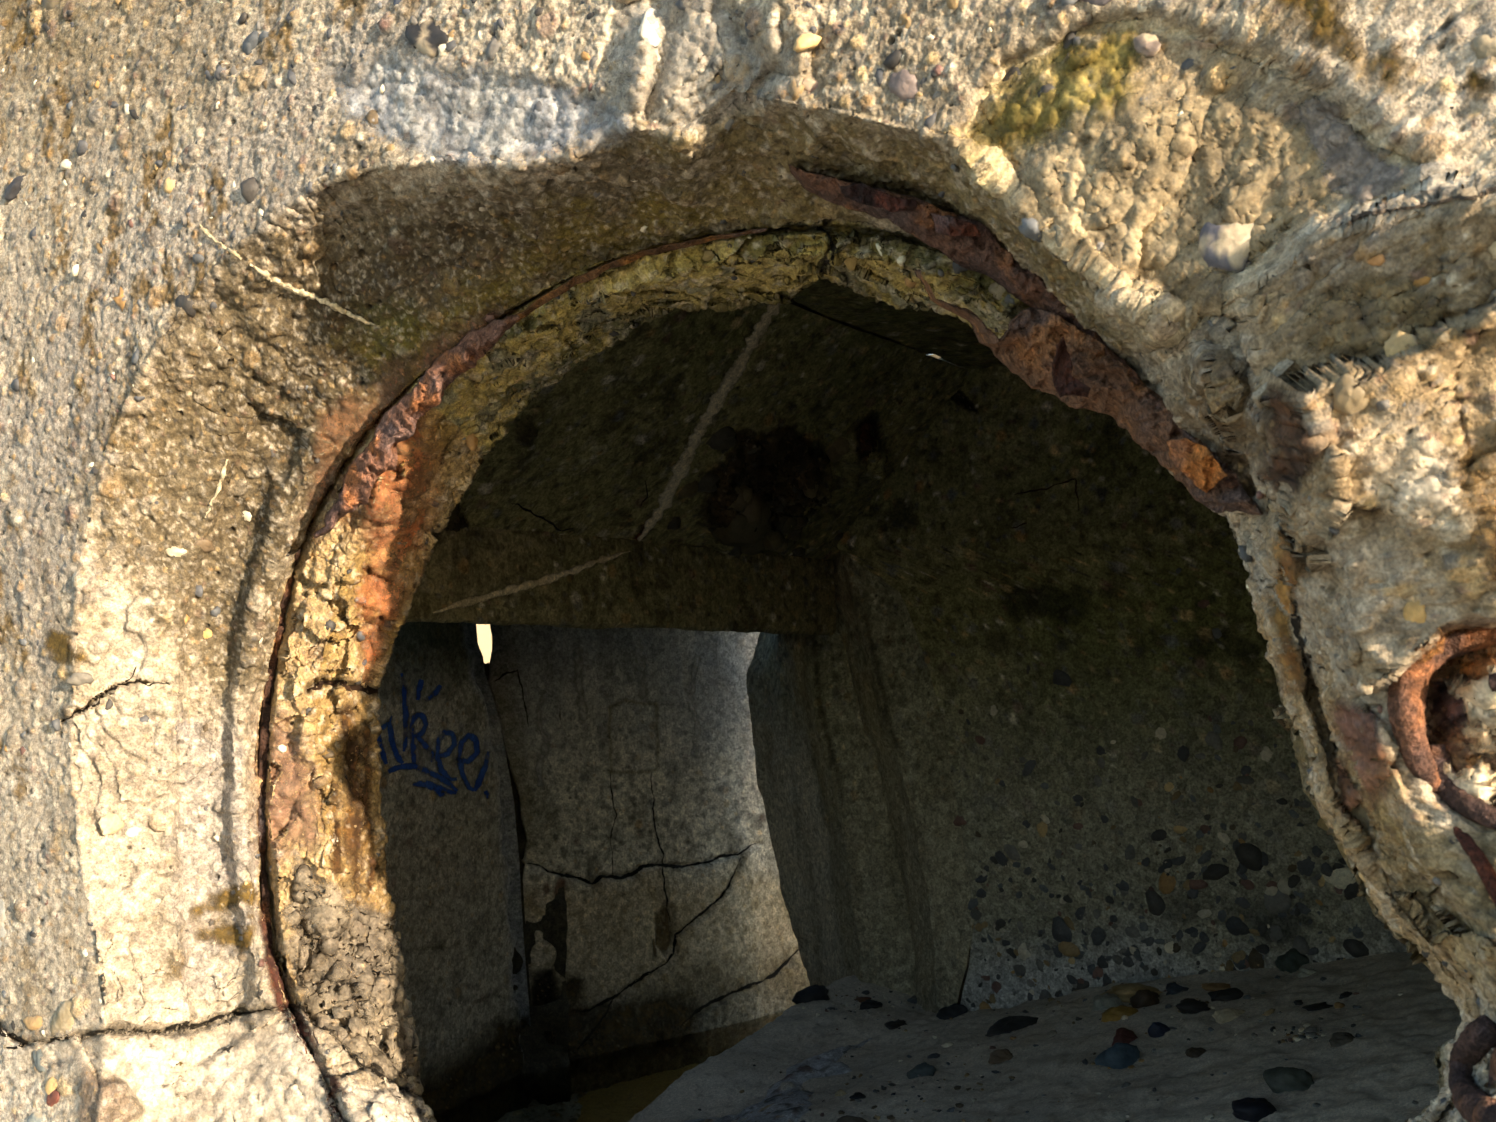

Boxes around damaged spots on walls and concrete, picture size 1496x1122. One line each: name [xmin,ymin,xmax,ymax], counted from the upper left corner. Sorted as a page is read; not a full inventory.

crack [1331,186,1496,229]
rust [306,310,505,540]
crack [1322,369,1394,398]
rust [363,420,440,665]
crack [63,666,170,721]
rust [259,714,316,841]
crack [495,669,529,726]
peeling [1443,665,1496,805]
crack [527,772,759,1055]
crack [681,949,799,1025]
crack [0,1003,424,1100]